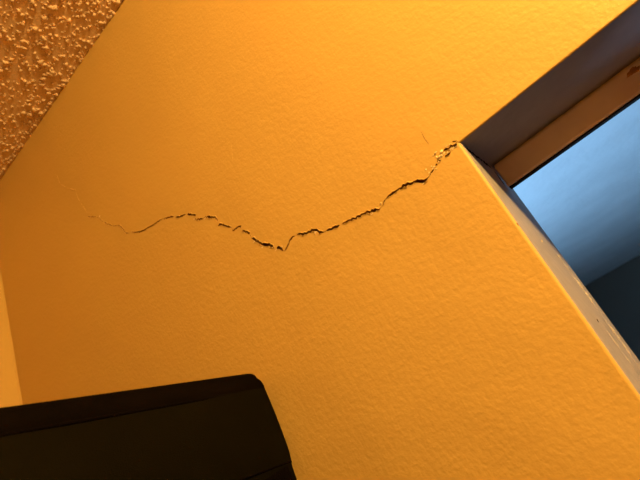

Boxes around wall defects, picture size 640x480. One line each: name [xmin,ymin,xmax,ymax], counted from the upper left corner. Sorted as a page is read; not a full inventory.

crack [57,132,504,253]